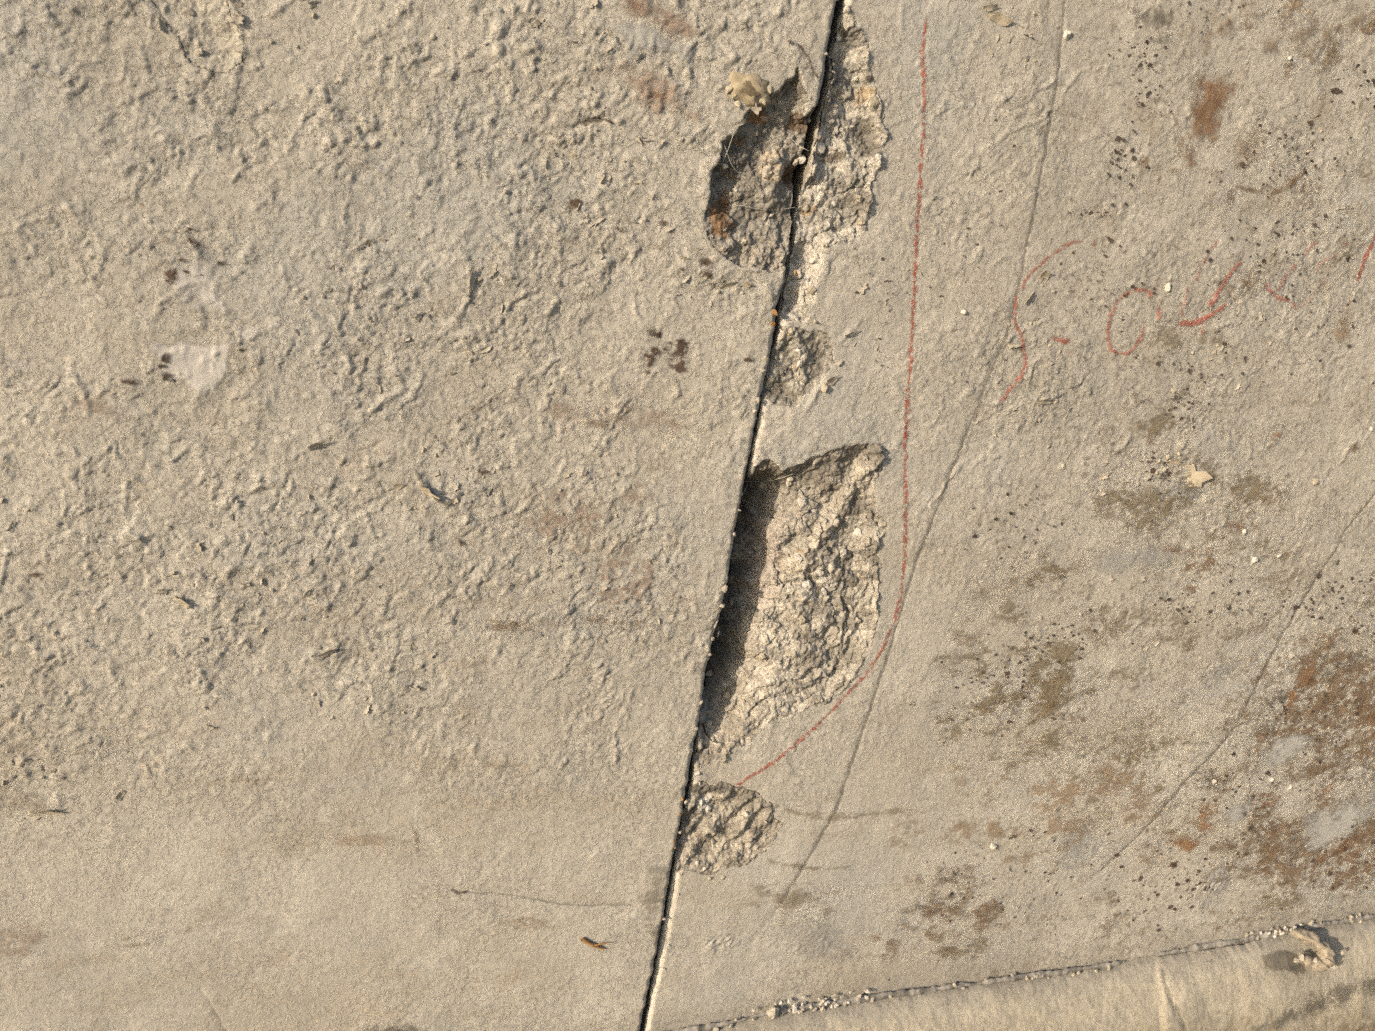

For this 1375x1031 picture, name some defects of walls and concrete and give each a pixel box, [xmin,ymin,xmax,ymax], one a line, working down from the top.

spalling [674,4,889,407]
crack [752,309,778,413]
crack [794,14,1064,880]
crack [694,508,742,730]
spalling [676,442,887,881]
rust [1288,661,1317,707]
crack [673,772,701,849]